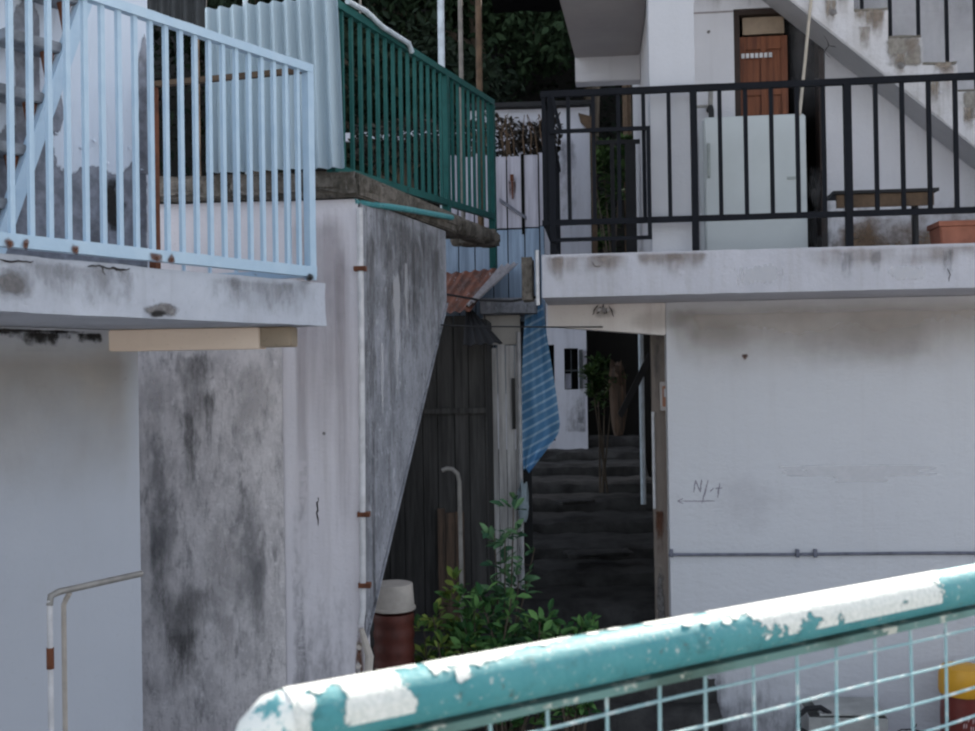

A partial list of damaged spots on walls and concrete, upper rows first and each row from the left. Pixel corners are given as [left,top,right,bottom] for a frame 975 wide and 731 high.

corrosion [5,239,29,249]
corrosion [151,253,175,263]
spalling [147,303,176,317]
mould [0,328,102,344]
peeling [276,563,975,731]